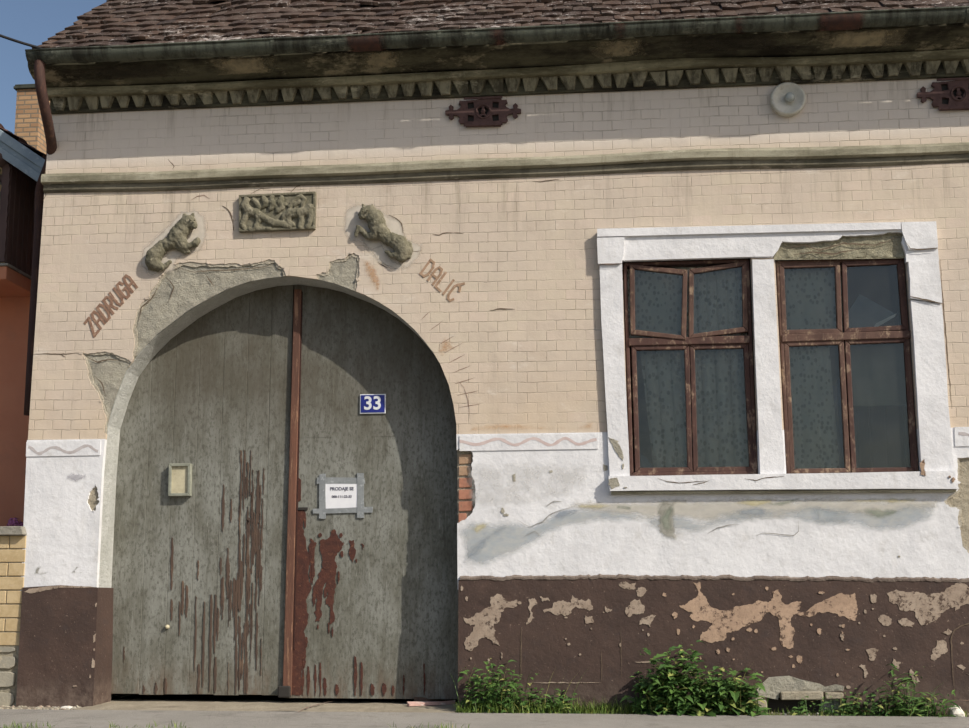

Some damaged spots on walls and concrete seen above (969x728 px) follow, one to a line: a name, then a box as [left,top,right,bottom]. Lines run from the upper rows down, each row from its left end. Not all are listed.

flaking render [457,450,476,523]
leakage [465,499,935,562]
peeling [464,594,612,661]
peeling [619,581,656,636]
peeling [672,582,969,713]